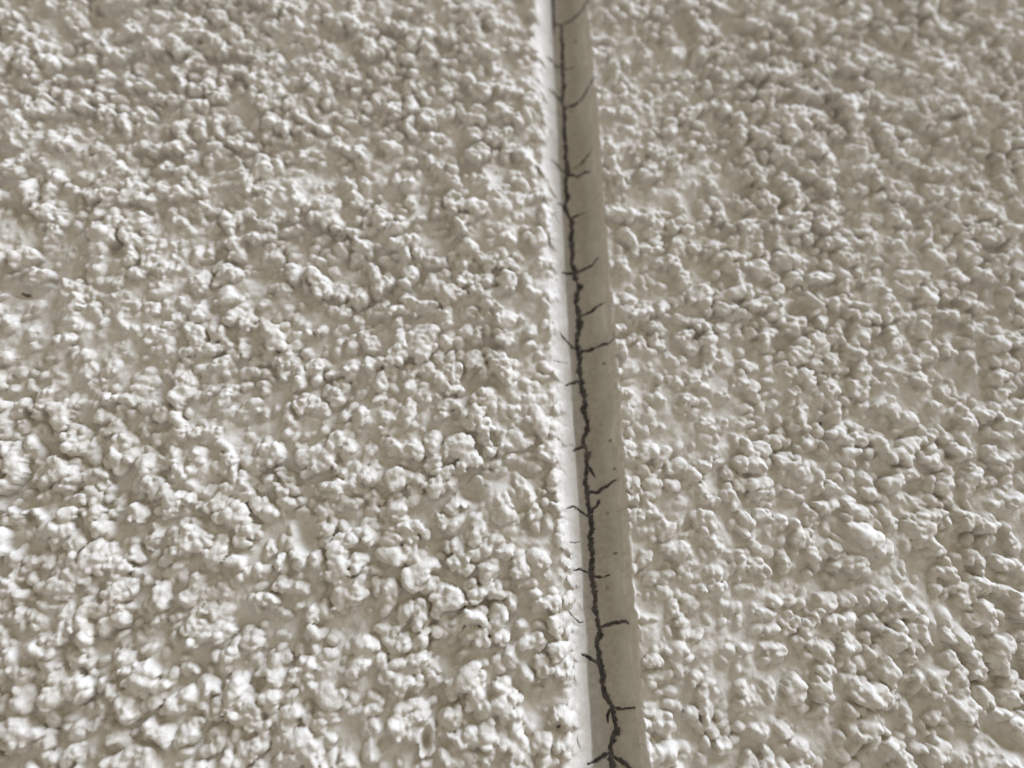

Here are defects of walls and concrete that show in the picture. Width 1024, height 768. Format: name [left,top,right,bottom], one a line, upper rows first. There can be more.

crack [543,0,635,768]